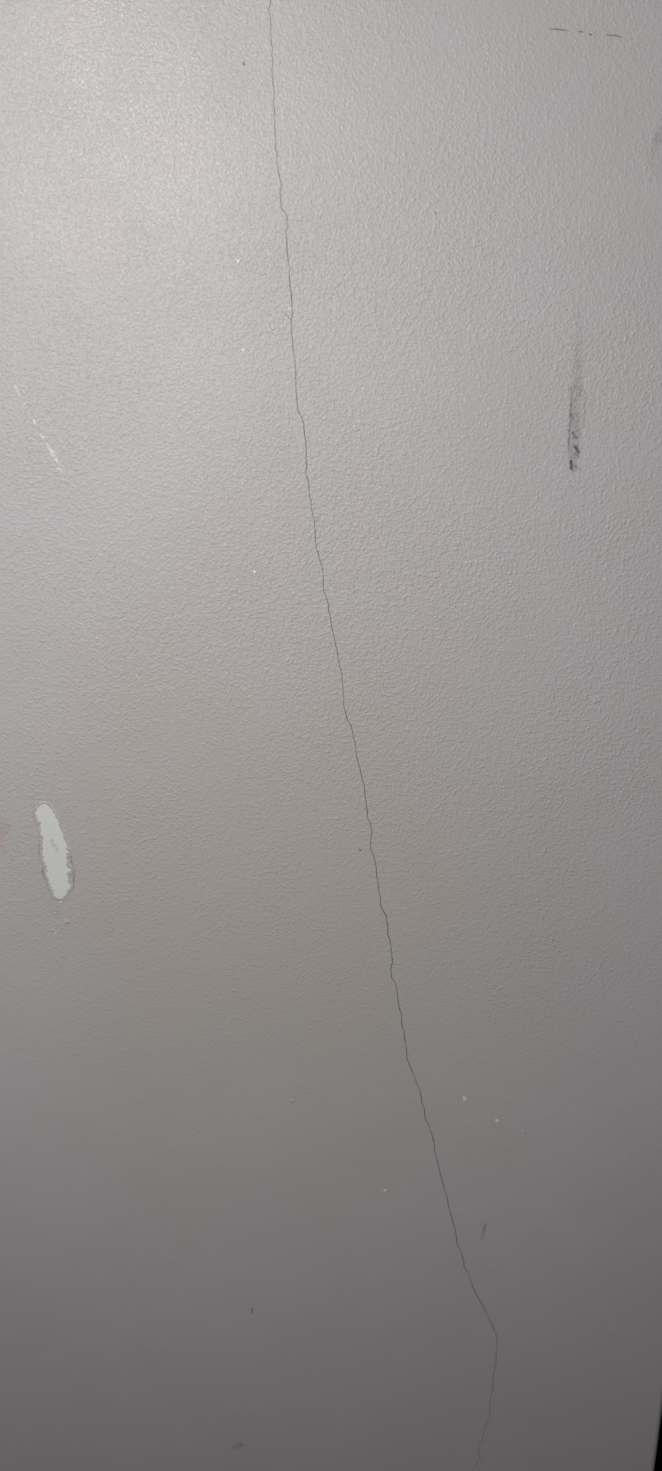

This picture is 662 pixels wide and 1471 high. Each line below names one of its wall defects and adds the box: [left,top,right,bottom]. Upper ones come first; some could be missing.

spalling [33,801,74,934]